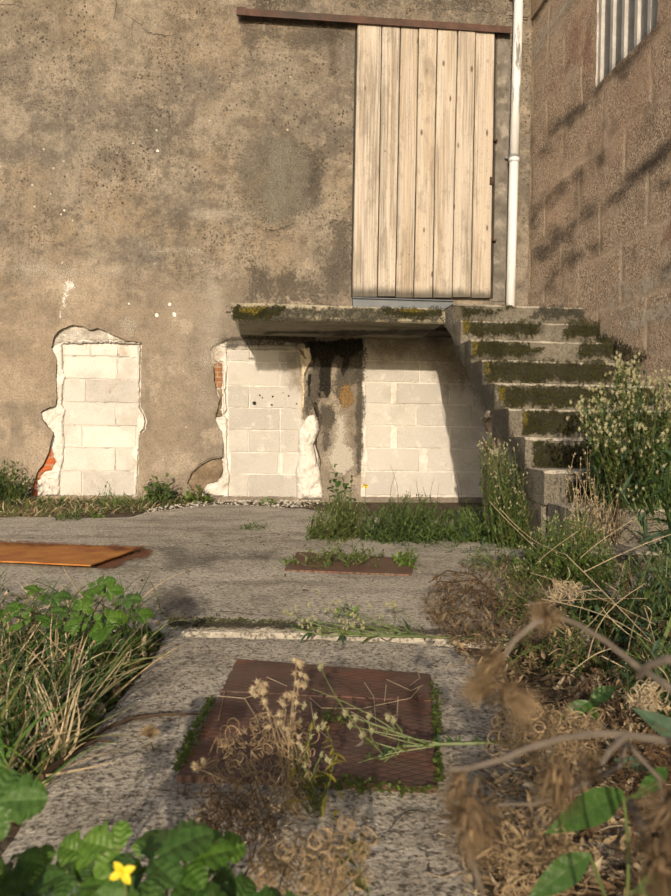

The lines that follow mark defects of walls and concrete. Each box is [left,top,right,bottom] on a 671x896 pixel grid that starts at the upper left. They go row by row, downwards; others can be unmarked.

crack [113,0,178,45]
leakage [239,20,351,55]
flaking render [213,363,223,417]
leakage [224,329,533,493]
flaking render [32,447,56,496]
peeling [188,457,223,494]